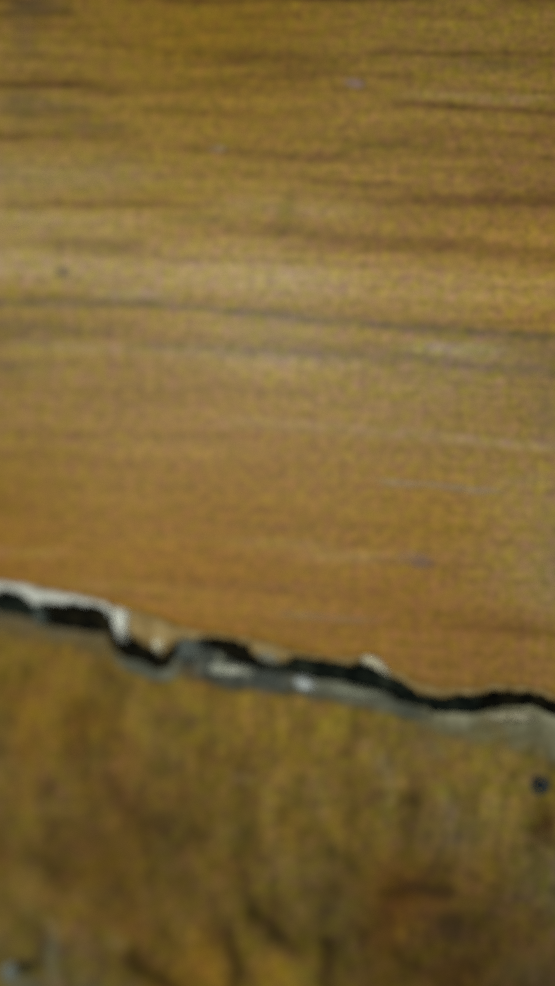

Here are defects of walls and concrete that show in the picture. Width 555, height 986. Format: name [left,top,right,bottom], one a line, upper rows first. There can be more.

crack [0,589,177,671]
crack [204,637,555,716]